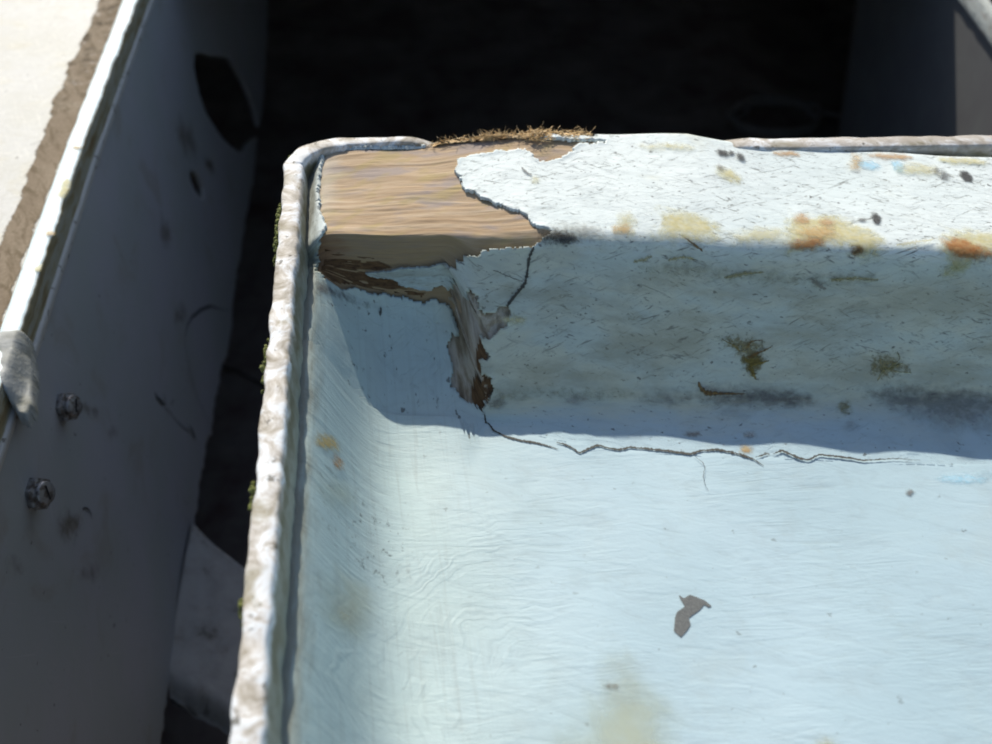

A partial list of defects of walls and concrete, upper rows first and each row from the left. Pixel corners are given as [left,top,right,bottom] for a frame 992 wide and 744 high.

peeling [317,124,597,412]
crack [493,247,534,307]
rust [663,213,715,252]
rust [737,214,882,256]
rust [944,232,992,269]
crack [484,414,914,483]
peeling [674,595,711,637]